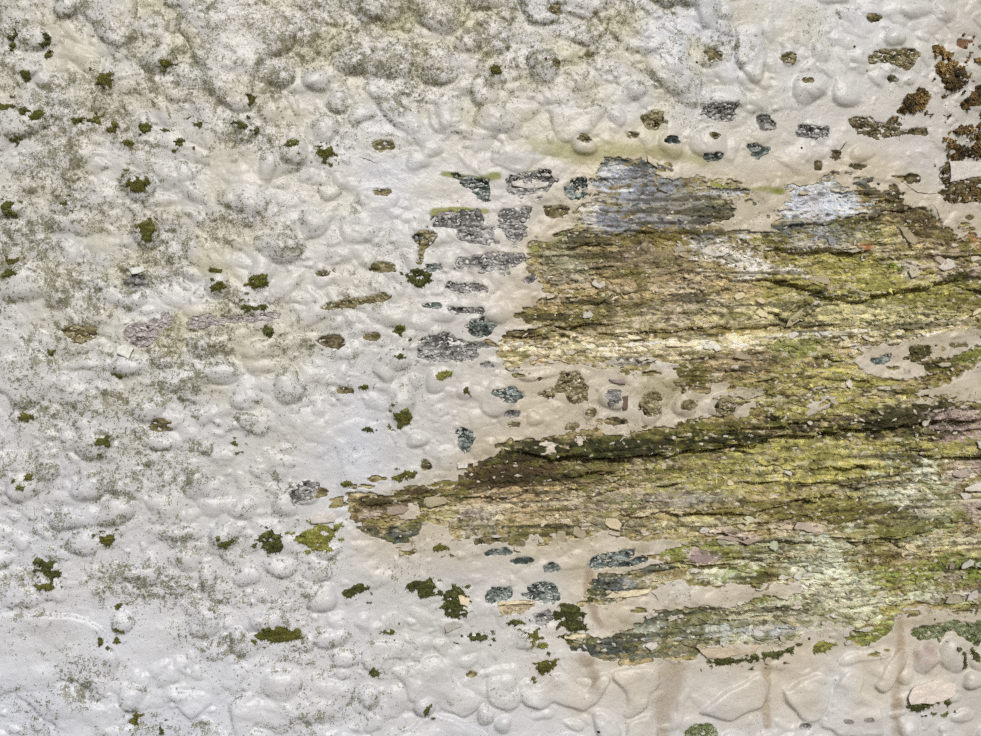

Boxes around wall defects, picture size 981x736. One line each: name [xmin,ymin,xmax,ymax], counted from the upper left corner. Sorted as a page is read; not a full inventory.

peeling [956,38,981,50]
peeling [866,48,921,83]
peeling [796,124,830,139]
peeling [848,116,929,141]
peeling [372,139,396,153]
peeling [290,150,981,671]